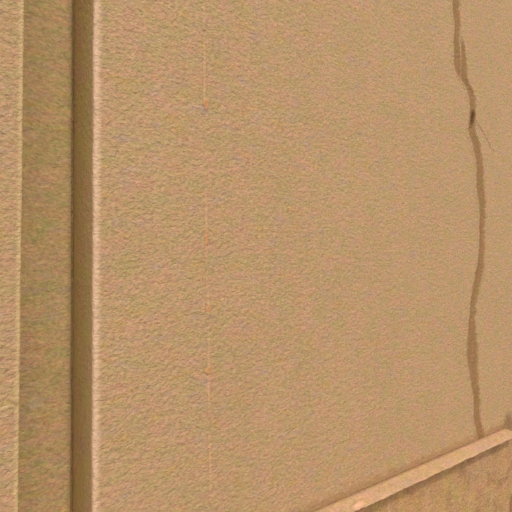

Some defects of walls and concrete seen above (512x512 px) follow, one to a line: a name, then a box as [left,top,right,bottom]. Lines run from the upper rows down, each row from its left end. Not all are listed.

crack [450,0,494,440]